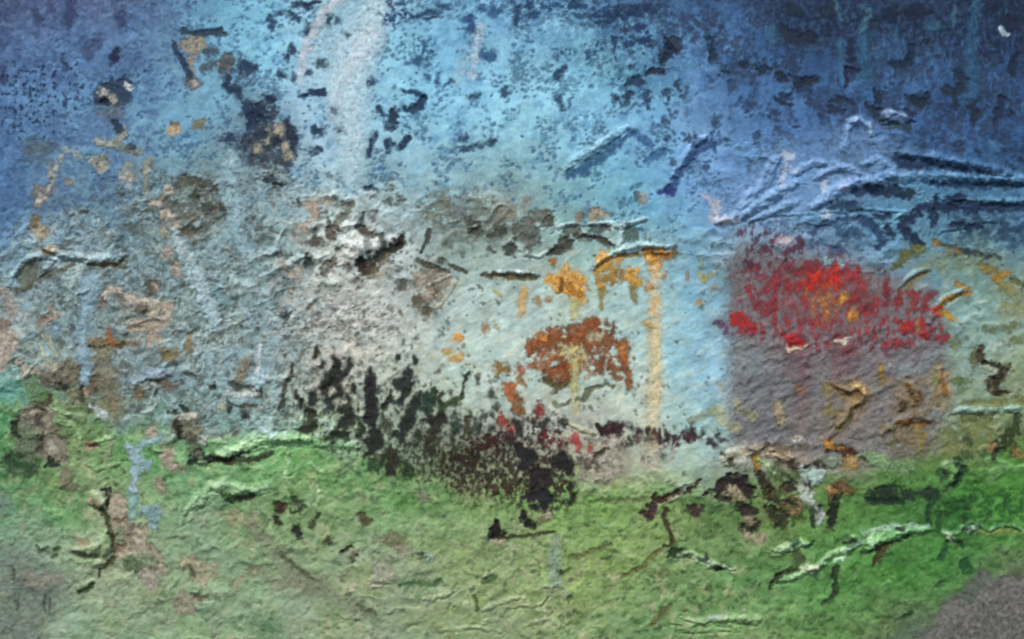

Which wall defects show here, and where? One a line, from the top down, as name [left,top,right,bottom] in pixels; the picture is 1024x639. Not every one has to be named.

spalling [266,0,340,36]
peeling [172,27,346,187]
spalling [366,105,412,158]
spalling [275,198,406,292]
spalling [423,189,639,258]
corrosion [443,333,464,363]
corrosion [490,246,677,455]
damp [226,325,577,515]
crack [768,571,783,590]
crack [822,565,840,605]
crack [872,542,889,567]
crack [937,538,974,575]